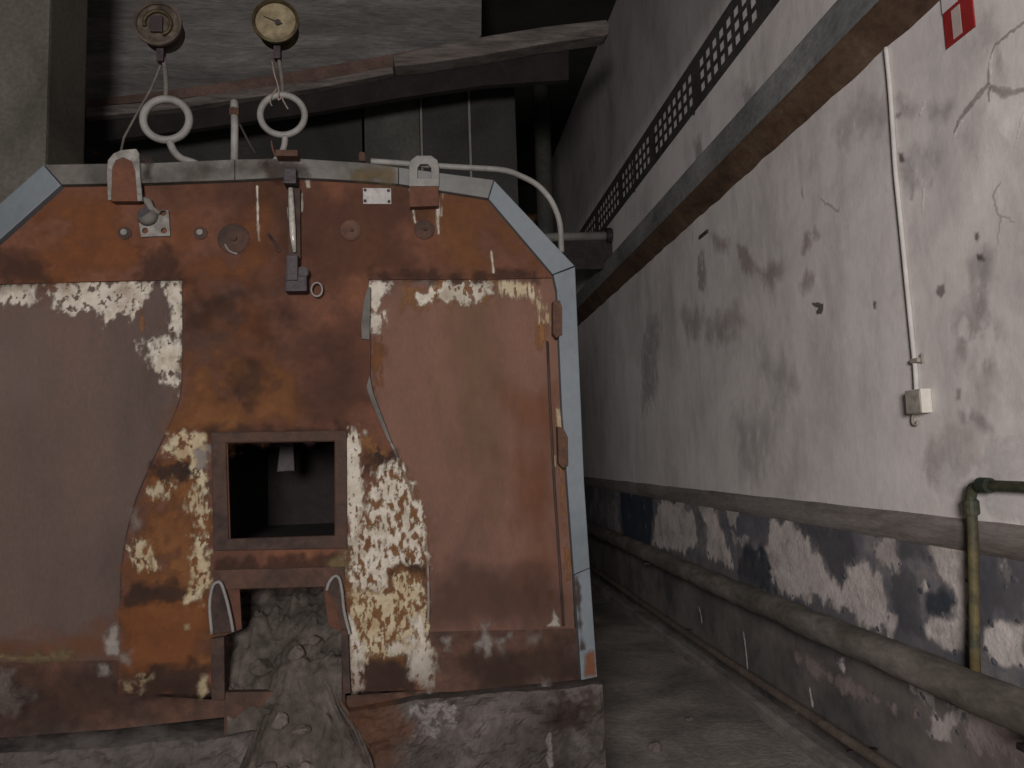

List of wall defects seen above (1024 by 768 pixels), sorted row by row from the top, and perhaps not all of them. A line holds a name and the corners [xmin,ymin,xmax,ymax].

crack [954,22,1024,138]
peeling [652,500,749,570]
peeling [763,518,902,639]
peeling [918,545,968,656]
peeling [983,619,1024,668]